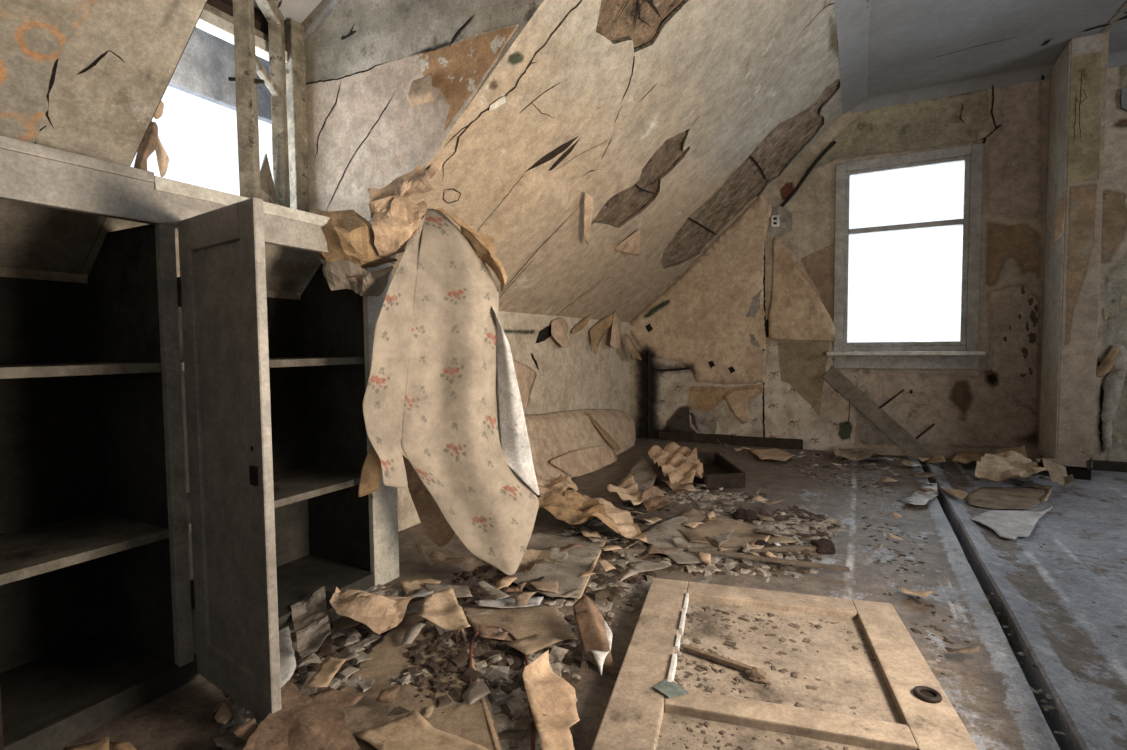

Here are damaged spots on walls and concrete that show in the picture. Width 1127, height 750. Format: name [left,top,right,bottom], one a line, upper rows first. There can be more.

peeling [416,26,517,131]
crack [442,0,582,204]
flaking render [582,125,693,231]
flaking render [591,0,692,59]
flaking render [659,77,841,271]
peeling [805,89,989,173]
crack [959,85,1002,144]
crack [931,36,1053,59]
crack [1073,73,1087,142]
peeling [1065,33,1127,366]
peeling [855,222,1040,448]
damp [950,381,972,415]